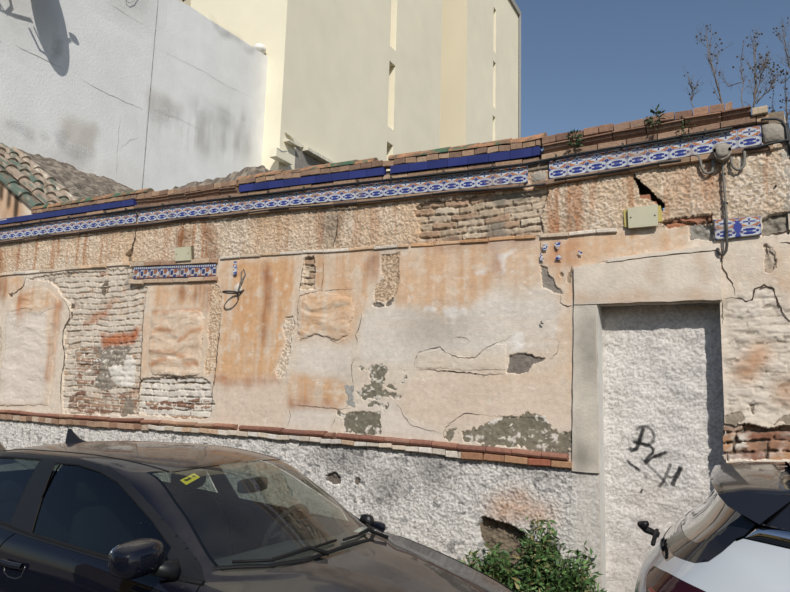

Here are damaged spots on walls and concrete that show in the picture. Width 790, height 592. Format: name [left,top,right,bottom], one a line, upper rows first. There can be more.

flaking render [414,189,549,243]
crack [765,230,790,267]
spalling [373,252,400,308]
spalling [541,266,572,294]
crack [721,248,790,324]
flaking render [30,253,222,419]
crack [414,337,509,375]
spalling [507,353,545,374]
spalling [337,364,407,435]
peeling [444,412,572,454]
flaking render [722,405,790,461]
spalling [480,516,529,572]